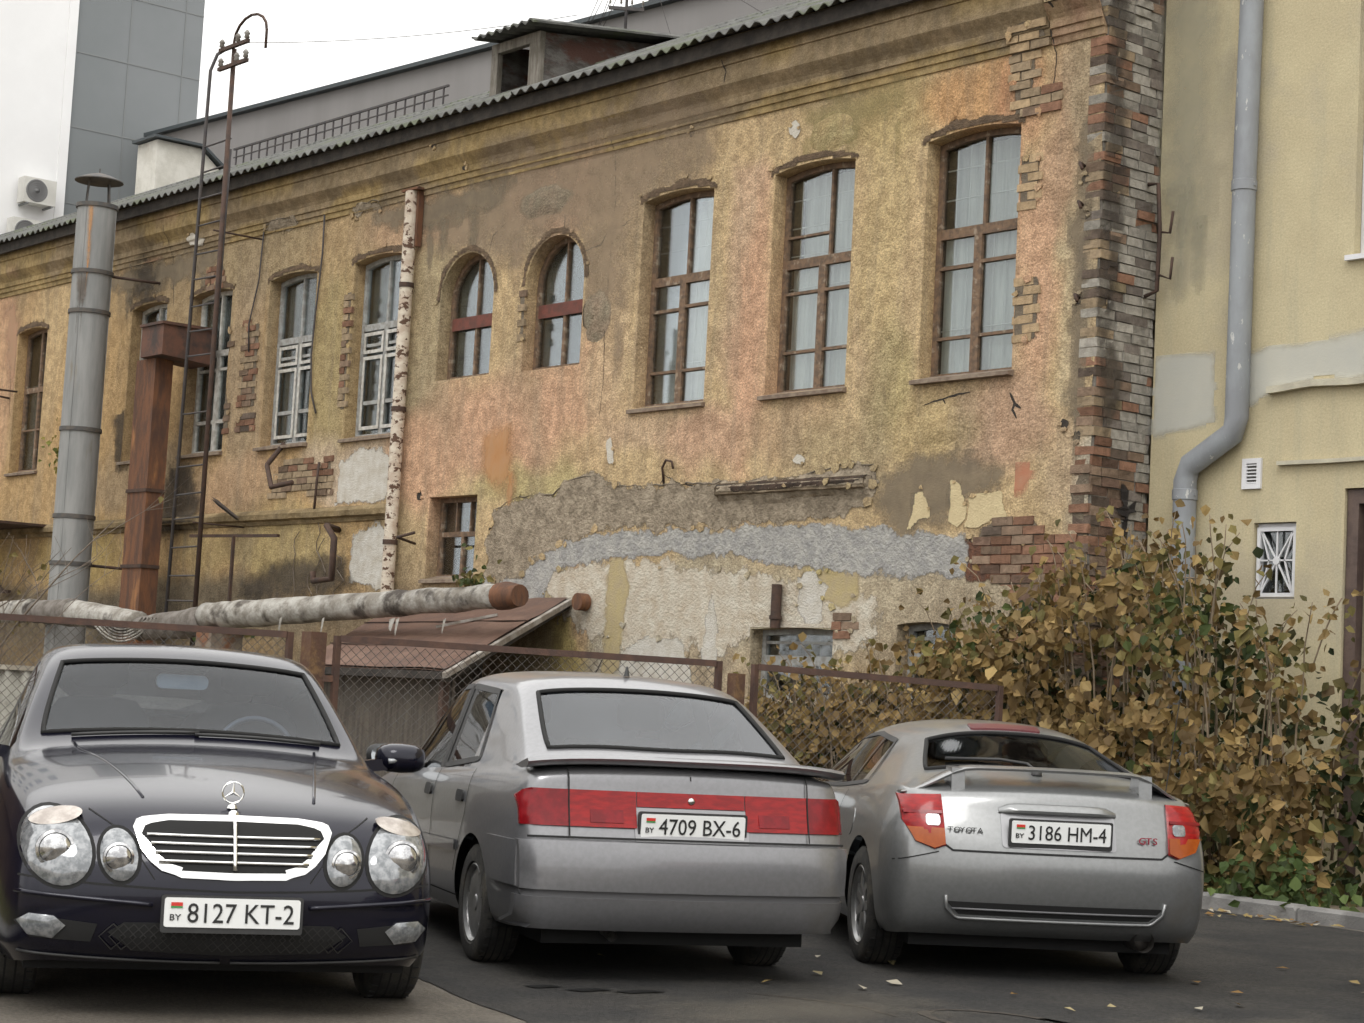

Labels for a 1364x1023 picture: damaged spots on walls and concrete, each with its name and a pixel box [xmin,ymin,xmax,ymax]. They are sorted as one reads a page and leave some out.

flaking render [1005,16,1064,117]
flaking render [1017,152,1044,212]
flaking render [1011,275,1041,344]
flaking render [221,319,260,434]
peeling [267,446,389,506]
peeling [349,520,384,590]
spalling [483,437,1092,683]